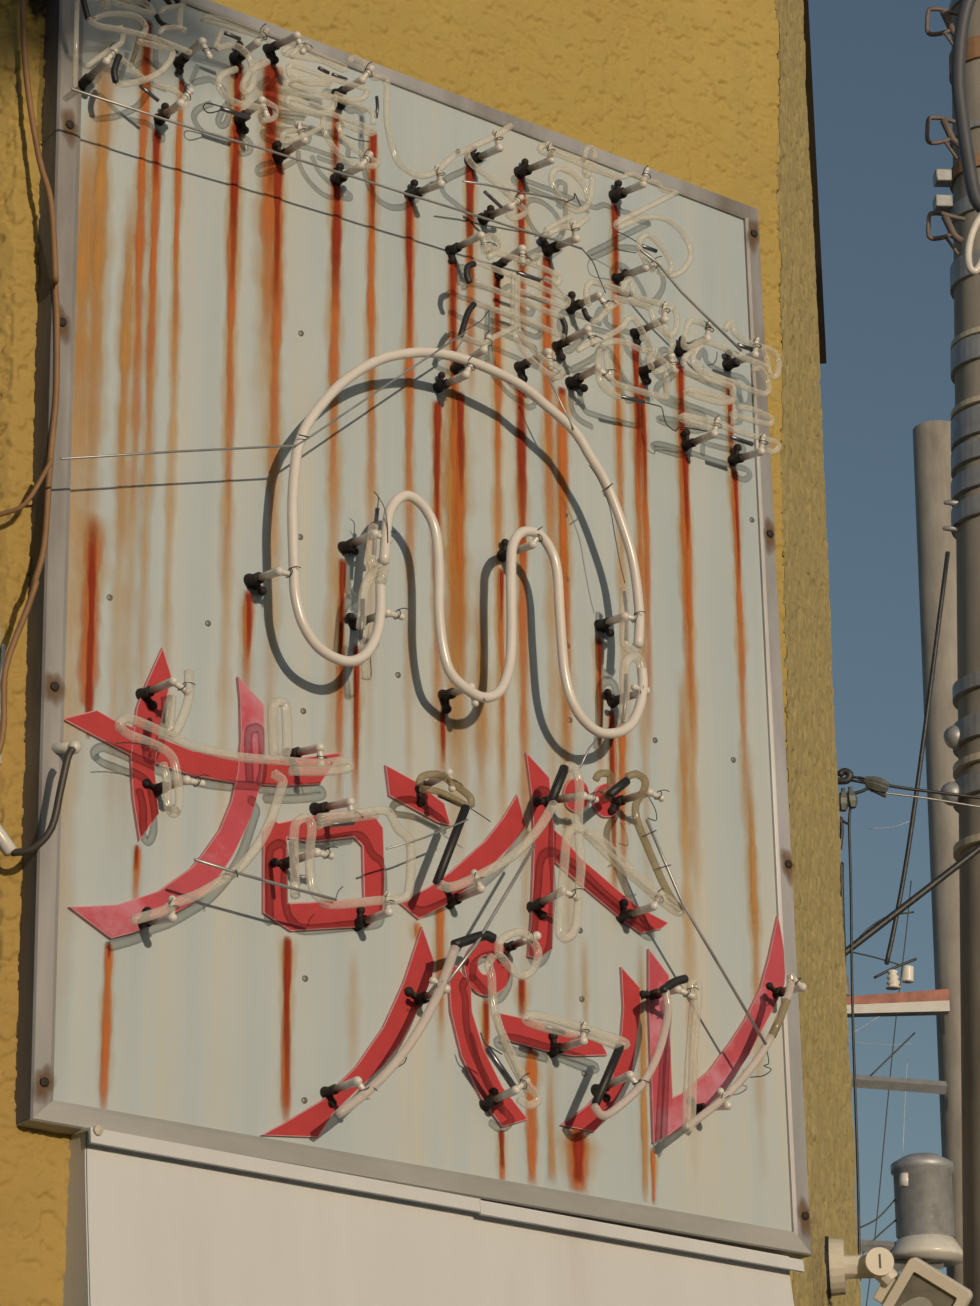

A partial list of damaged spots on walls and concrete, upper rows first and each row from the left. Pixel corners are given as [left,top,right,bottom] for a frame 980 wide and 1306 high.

corrosion [70,496,99,712]
corrosion [120,21,184,493]
corrosion [225,64,242,457]
corrosion [262,64,283,488]
corrosion [329,184,342,506]
corrosion [405,200,414,510]
corrosion [434,166,474,629]
corrosion [498,389,526,679]
corrosion [543,258,569,623]
corrosion [612,205,650,596]
corrosion [677,363,694,722]
corrosion [282,939,291,1109]